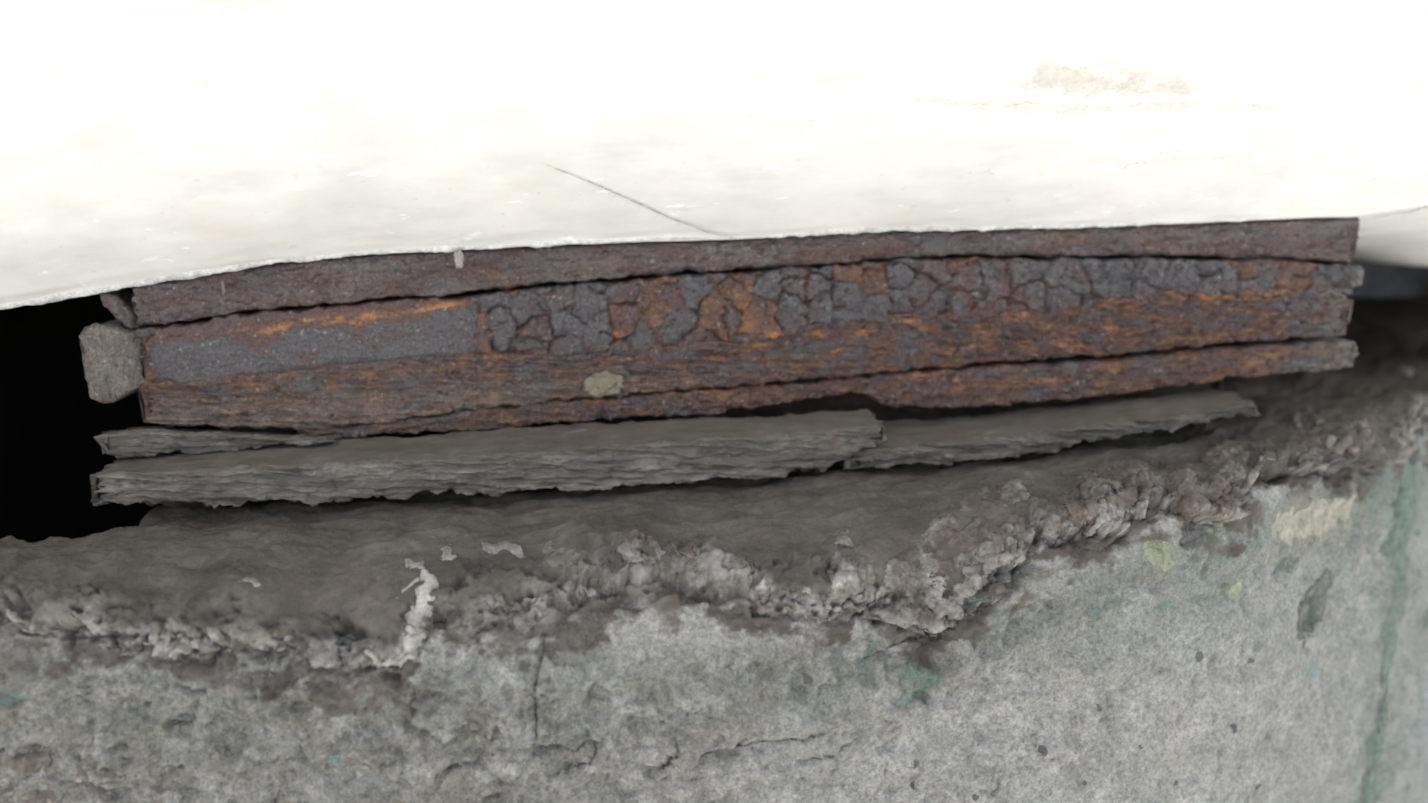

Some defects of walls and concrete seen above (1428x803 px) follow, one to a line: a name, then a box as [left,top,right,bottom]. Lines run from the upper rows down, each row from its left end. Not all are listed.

rust [100,290,150,329]
rust [90,389,1260,508]
spalling [1063,431,1259,537]
leakage [1359,431,1428,803]